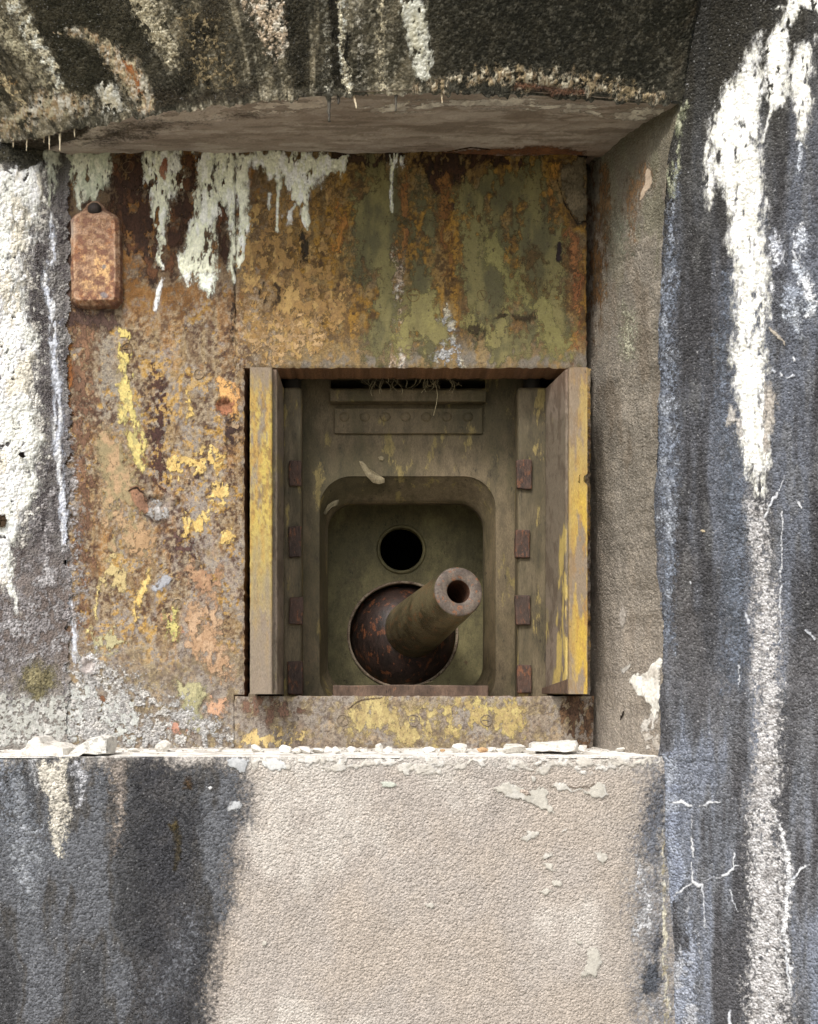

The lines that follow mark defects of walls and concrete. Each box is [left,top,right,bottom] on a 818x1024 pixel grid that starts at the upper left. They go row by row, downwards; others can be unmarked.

leakage [240,0,387,95]
rust [107,154,197,286]
leakage [0,0,349,615]
rust [215,203,236,343]
rust [65,281,120,641]
rust [141,361,172,493]
peeling [166,441,229,538]
peeling [215,376,240,417]
leakage [704,0,818,1024]
peeling [227,657,663,813]
leakage [0,756,254,1024]
crack [673,799,739,928]